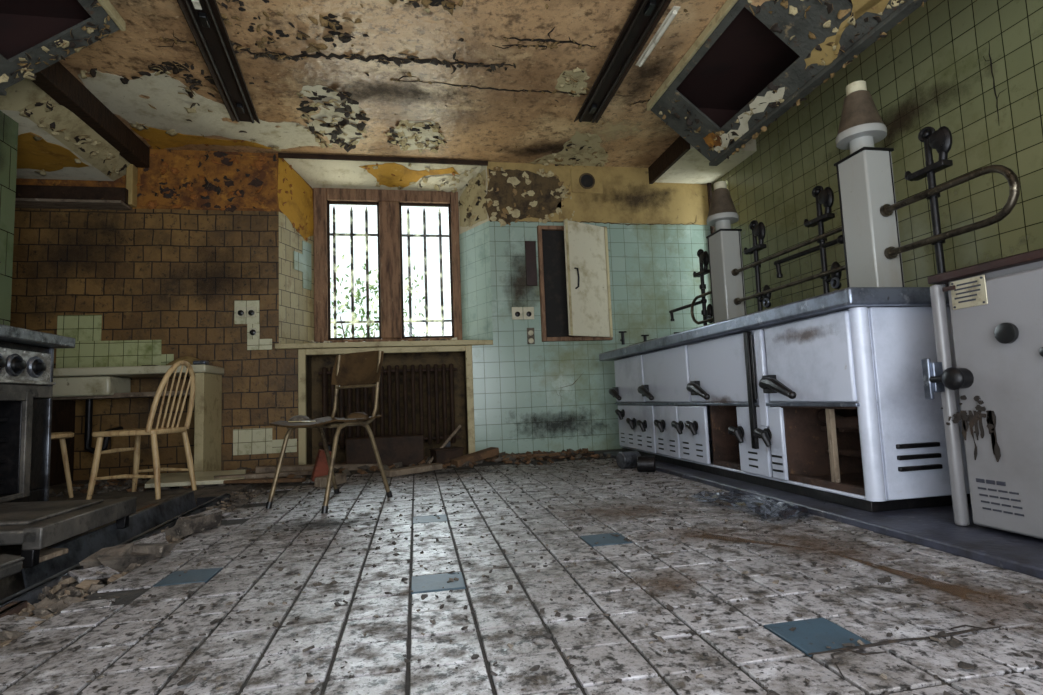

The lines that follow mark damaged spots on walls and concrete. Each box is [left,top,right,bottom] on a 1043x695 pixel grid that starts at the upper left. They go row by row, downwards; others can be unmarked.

peeling [0,0,111,83]
peeling [216,0,369,53]
crack [230,27,597,96]
peeling [389,0,466,15]
peeling [747,0,905,83]
peeling [17,99,127,176]
peeling [78,61,370,290]
peeling [359,113,616,227]
peeling [659,82,807,159]
leakage [525,415,587,437]
spalling [0,615,46,634]
spalling [61,598,116,613]